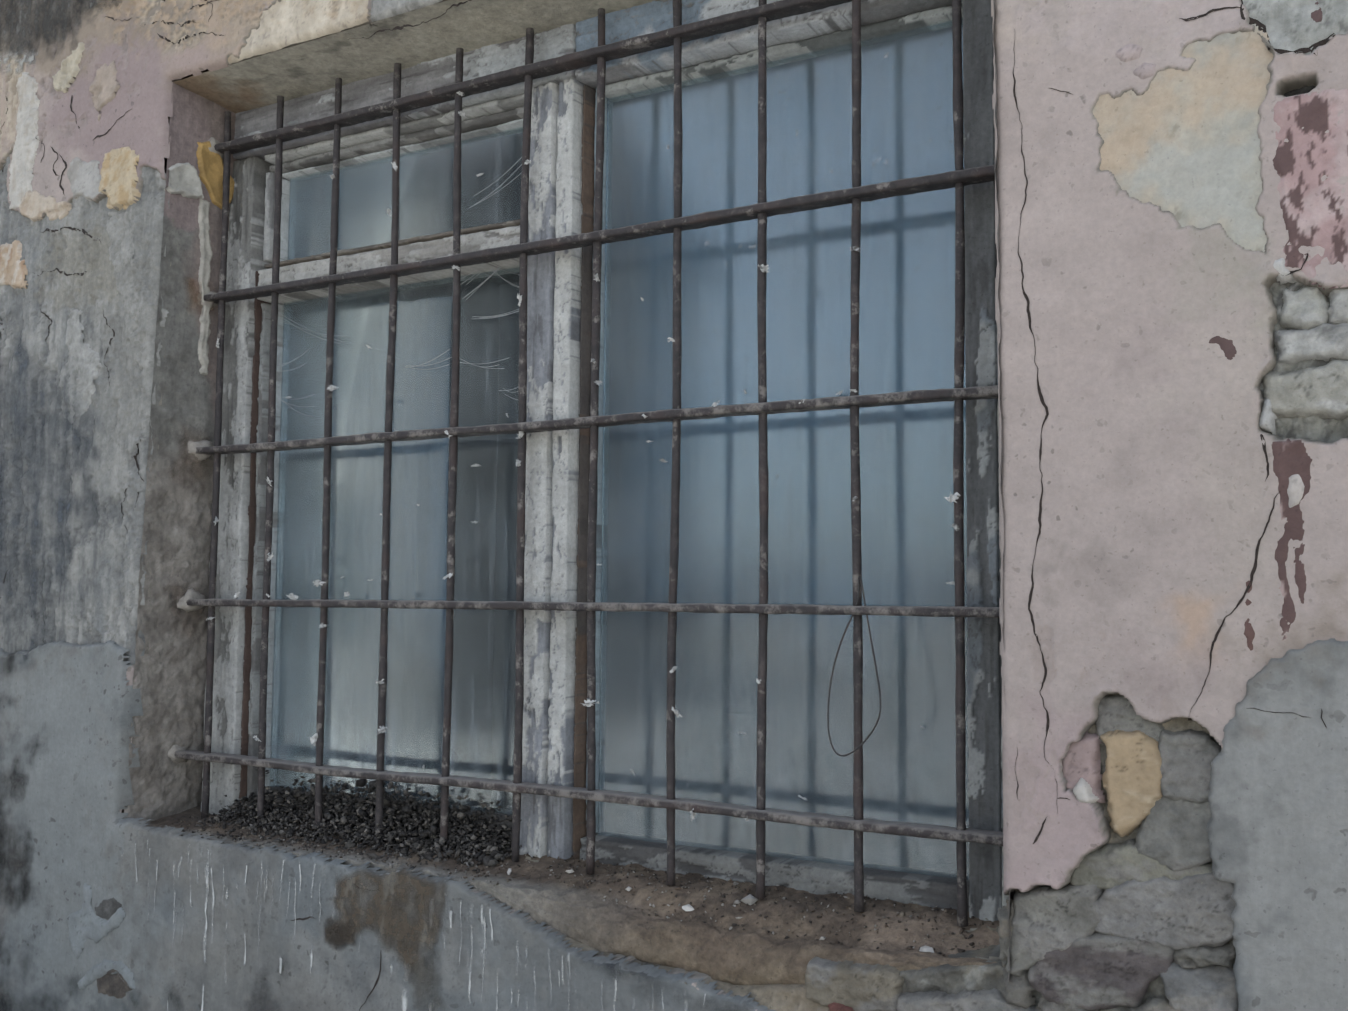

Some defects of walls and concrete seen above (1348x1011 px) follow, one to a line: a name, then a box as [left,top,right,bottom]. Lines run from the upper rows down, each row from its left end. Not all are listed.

leakage [0,0,116,73]
peeling [105,0,224,44]
peeling [228,0,443,64]
crack [1179,7,1240,21]
leakage [0,342,93,620]
peeling [0,42,235,669]
crack [1013,42,1070,844]
peeling [1093,0,1348,651]
crack [1188,434,1278,721]
leakage [0,760,30,904]
leakage [325,865,471,1011]
spalling [706,693,1238,1011]